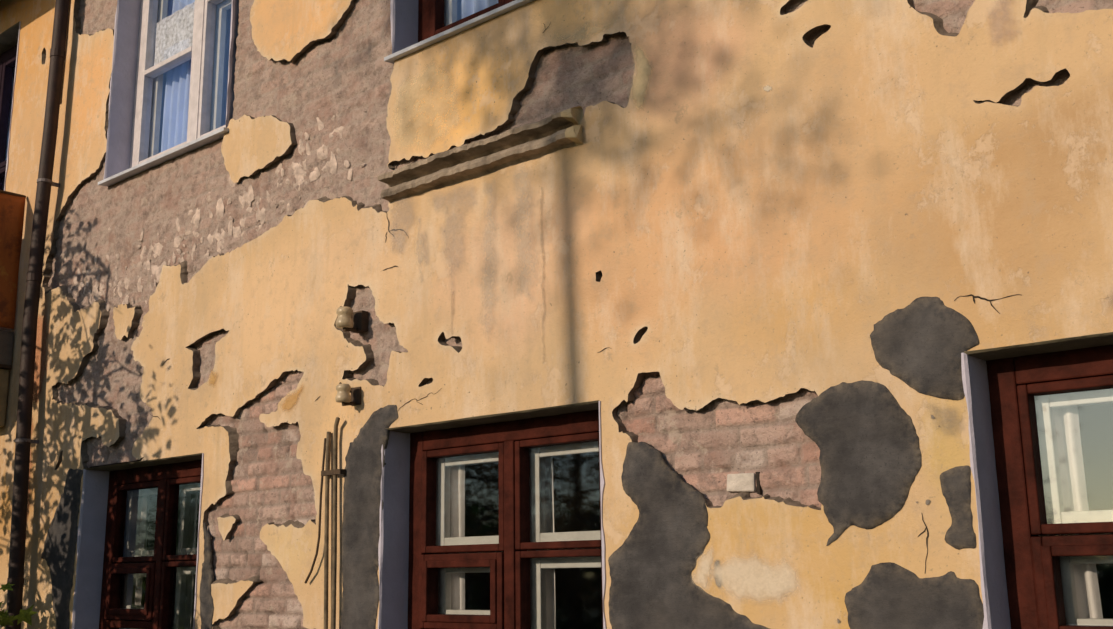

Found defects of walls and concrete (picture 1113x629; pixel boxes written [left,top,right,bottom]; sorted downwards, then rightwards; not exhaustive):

flaking render [907,0,975,37]
flaking render [973,68,1070,107]
flaking render [42,0,635,469]
crack [954,294,1020,314]
flaking render [196,370,317,629]
flaking render [612,372,822,510]